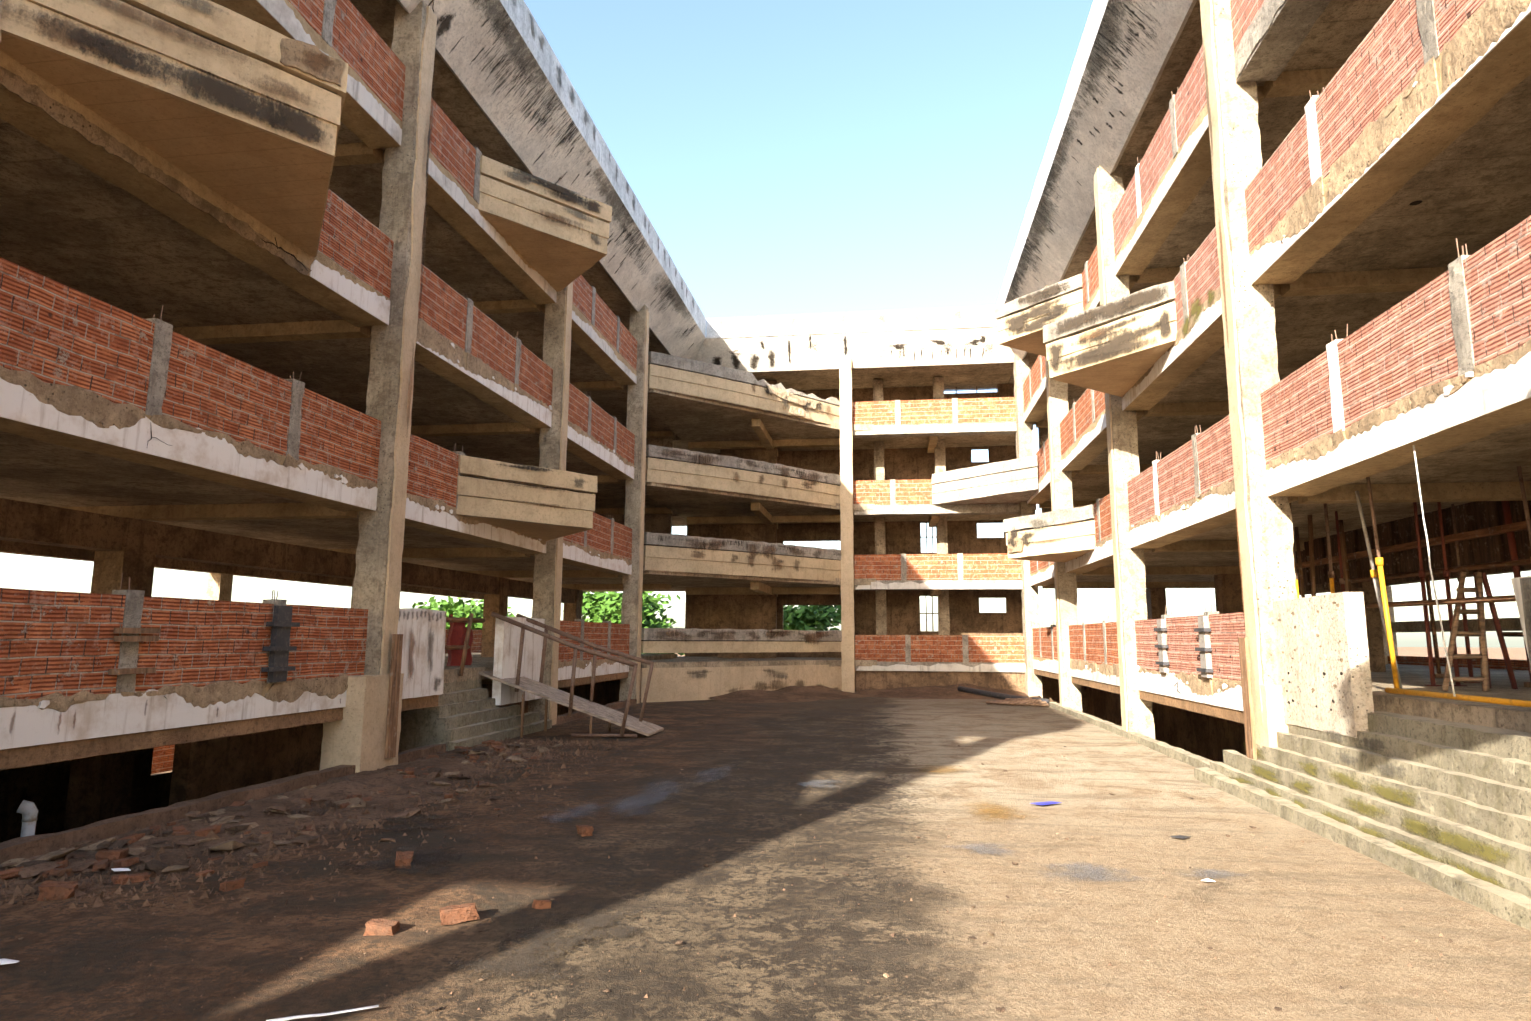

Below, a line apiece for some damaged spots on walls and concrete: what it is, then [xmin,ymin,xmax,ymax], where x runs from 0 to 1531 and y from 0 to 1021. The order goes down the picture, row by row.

water stain [92,0,239,57]
water stain [20,9,325,142]
water stain [302,51,330,71]
water stain [436,0,697,350]
water stain [877,0,1215,370]
peeling [0,365,375,489]
water stain [713,335,830,417]
peeling [1267,338,1531,471]
water stain [1520,577,1531,670]
peeling [0,673,349,712]